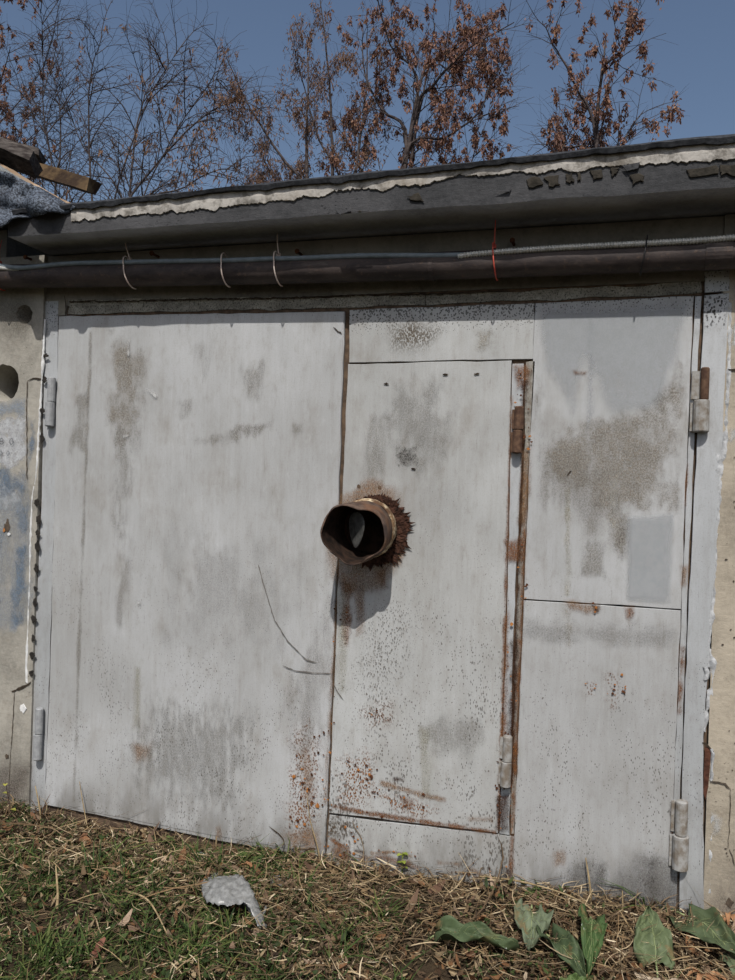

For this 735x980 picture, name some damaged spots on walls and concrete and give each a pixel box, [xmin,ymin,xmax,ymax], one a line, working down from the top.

peeling [71,143,735,222]
rust [289,366,533,862]
crack [711,781,735,866]